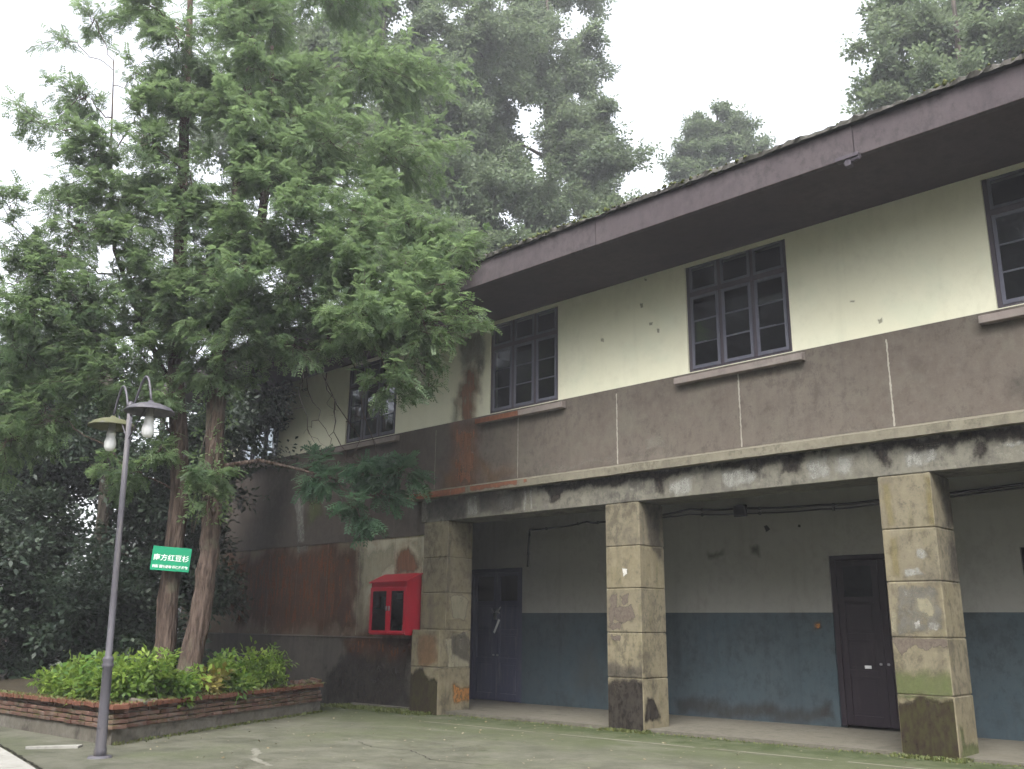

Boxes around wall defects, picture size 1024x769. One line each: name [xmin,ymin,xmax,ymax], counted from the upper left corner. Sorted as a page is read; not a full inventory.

water stain [431,425,1024,522]
rust [396,548,418,574]
water stain [323,631,412,706]
water stain [608,665,660,731]
water stain [899,696,965,759]